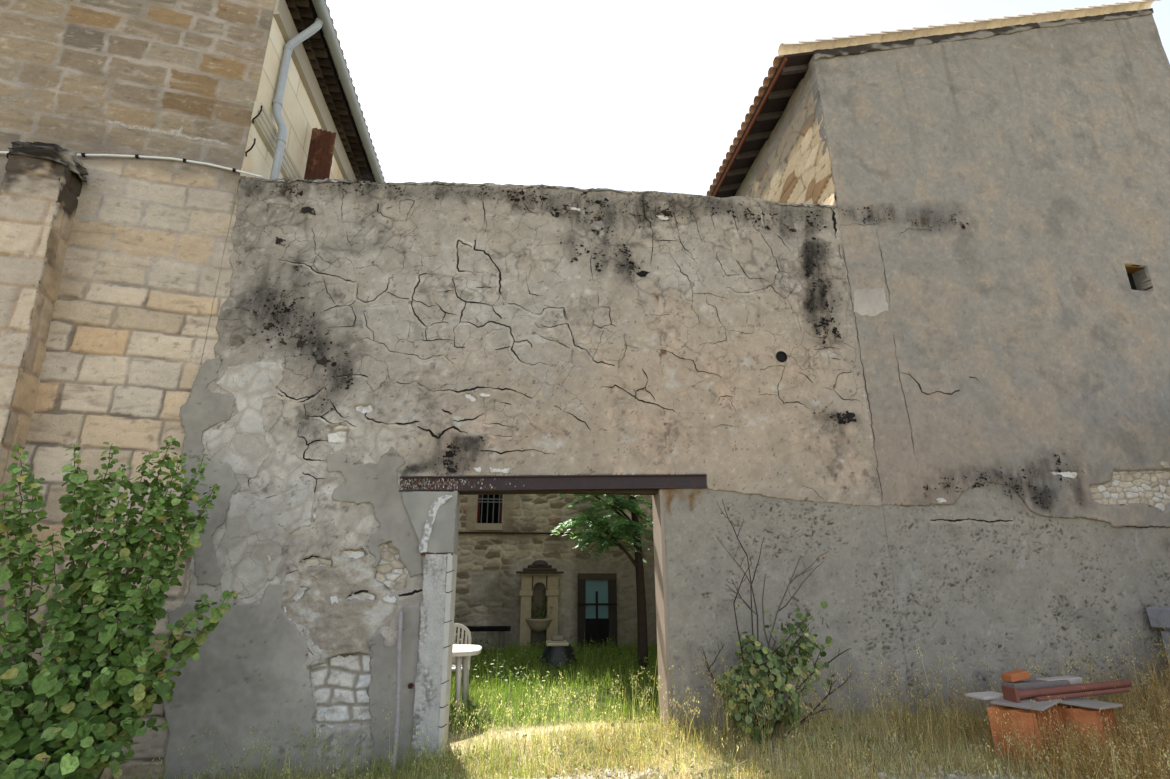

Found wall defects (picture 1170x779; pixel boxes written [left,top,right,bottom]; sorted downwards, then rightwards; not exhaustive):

peeling [203,362,284,479]
flaking render [231,309,275,345]
water stain [249,259,354,420]
flaking render [325,424,349,444]
crack [236,192,790,493]
water stain [420,185,841,348]
crack [760,209,926,494]
crack [893,335,979,457]
crack [930,518,1013,526]
water stain [923,453,1083,511]
flaking render [1089,461,1170,511]
flaking render [215,480,409,728]